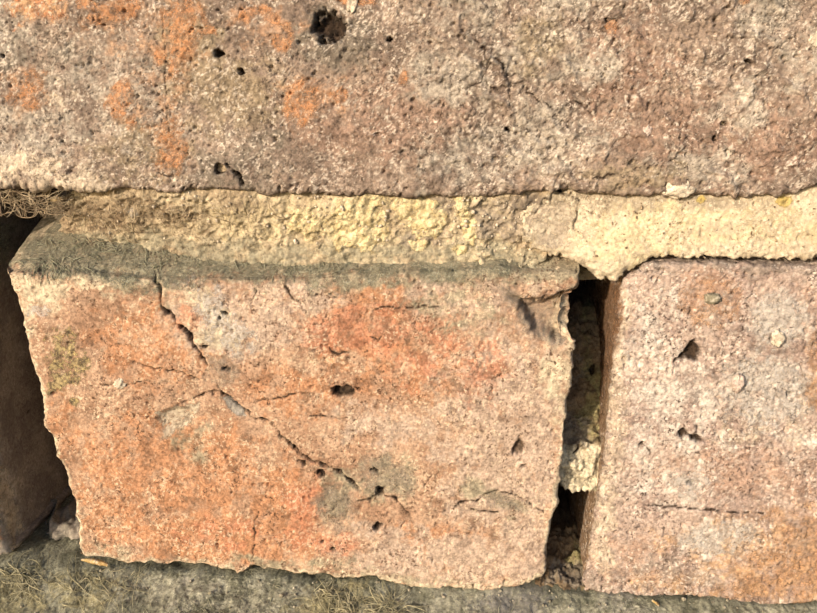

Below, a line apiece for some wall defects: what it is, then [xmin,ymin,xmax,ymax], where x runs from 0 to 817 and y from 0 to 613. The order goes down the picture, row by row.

crack [103,282,304,420]
crack [281,435,409,513]